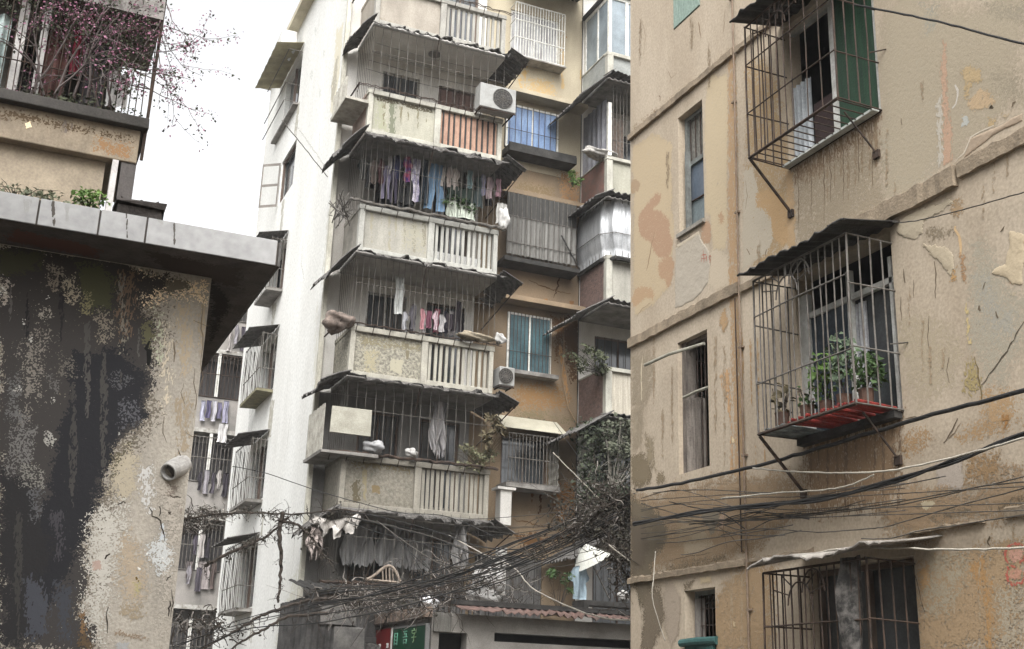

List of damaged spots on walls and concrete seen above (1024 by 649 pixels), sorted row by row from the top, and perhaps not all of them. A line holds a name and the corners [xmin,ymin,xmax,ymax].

water stain [0,201,245,649]
peeling [631,72,729,315]
water stain [741,1,944,277]
peeling [935,64,998,167]
crack [974,283,1024,400]
spalling [992,231,1024,285]